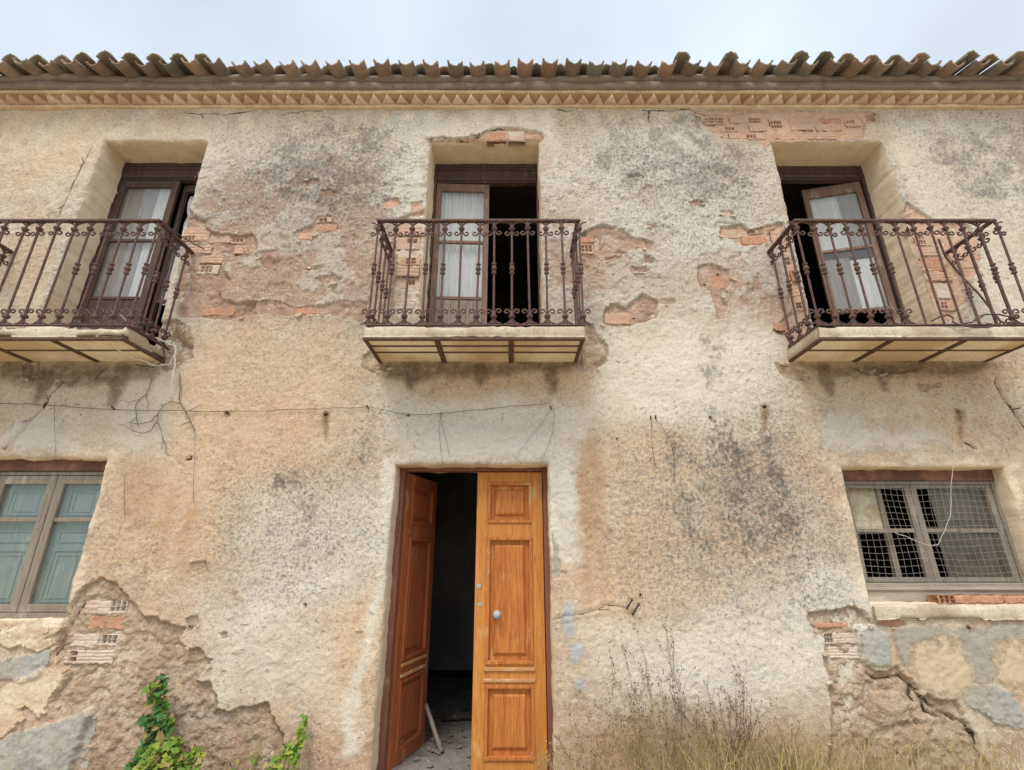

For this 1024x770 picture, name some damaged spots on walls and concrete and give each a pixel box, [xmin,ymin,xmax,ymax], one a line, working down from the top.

flaking render [429,128,544,147]
flaking render [694,107,879,149]
flaking render [578,225,656,274]
flaking render [155,211,368,371]
damp [388,361,580,390]
flaking render [0,578,287,770]
flaking render [807,603,987,770]
peeling [994,637,1024,686]
crack [869,674,978,752]